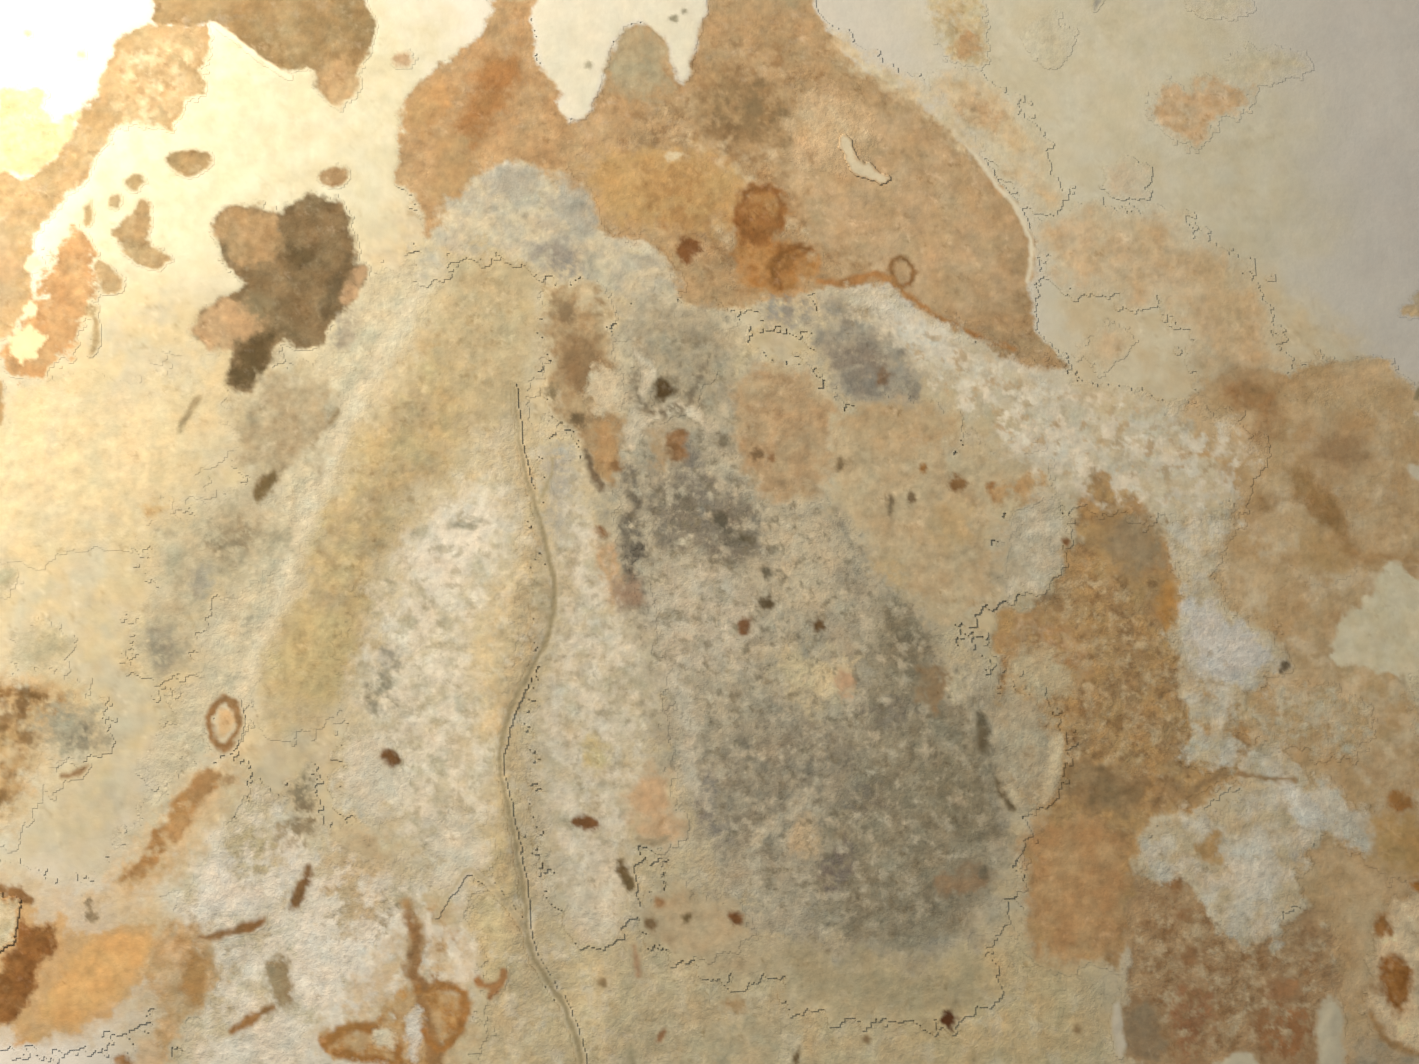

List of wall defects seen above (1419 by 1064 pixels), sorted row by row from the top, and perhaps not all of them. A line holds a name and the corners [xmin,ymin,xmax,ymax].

peeling [0,0,379,428]
peeling [392,0,1071,370]
water stain [924,66,1288,375]
peeling [1398,290,1419,320]
corrosion [0,654,267,1064]
corrosion [269,816,325,915]
corrosion [302,890,508,1064]
crack [434,381,586,1064]
water stain [0,156,1125,1064]
water stain [752,279,1378,956]
peeling [982,504,1419,1064]
peeling [1210,349,1419,812]